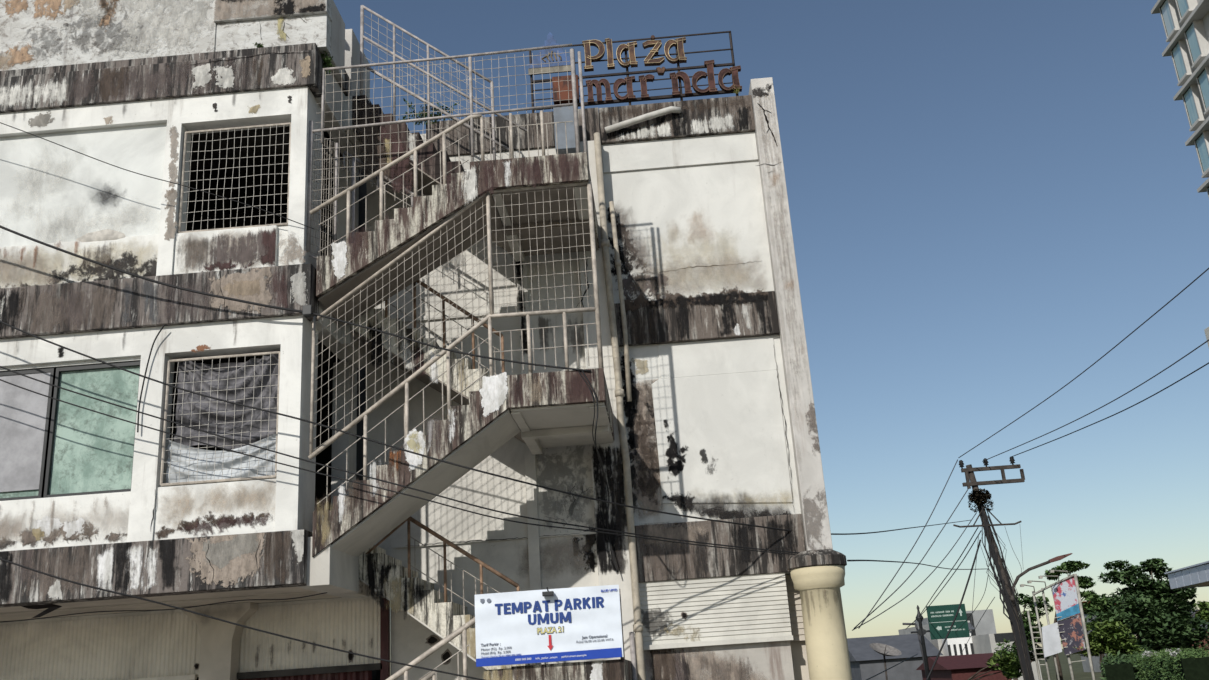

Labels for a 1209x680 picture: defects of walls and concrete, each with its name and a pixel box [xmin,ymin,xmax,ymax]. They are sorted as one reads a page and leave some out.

peeling [0,40,33,68]
peeling [0,79,67,108]
peeling [4,0,213,56]
spalling [191,64,235,89]
water stain [0,229,305,334]
water stain [606,207,668,300]
peeling [479,372,509,417]
peeling [404,420,433,471]
water stain [573,312,797,578]
water stain [0,501,131,602]
water stain [155,462,379,590]
water stain [641,608,760,680]